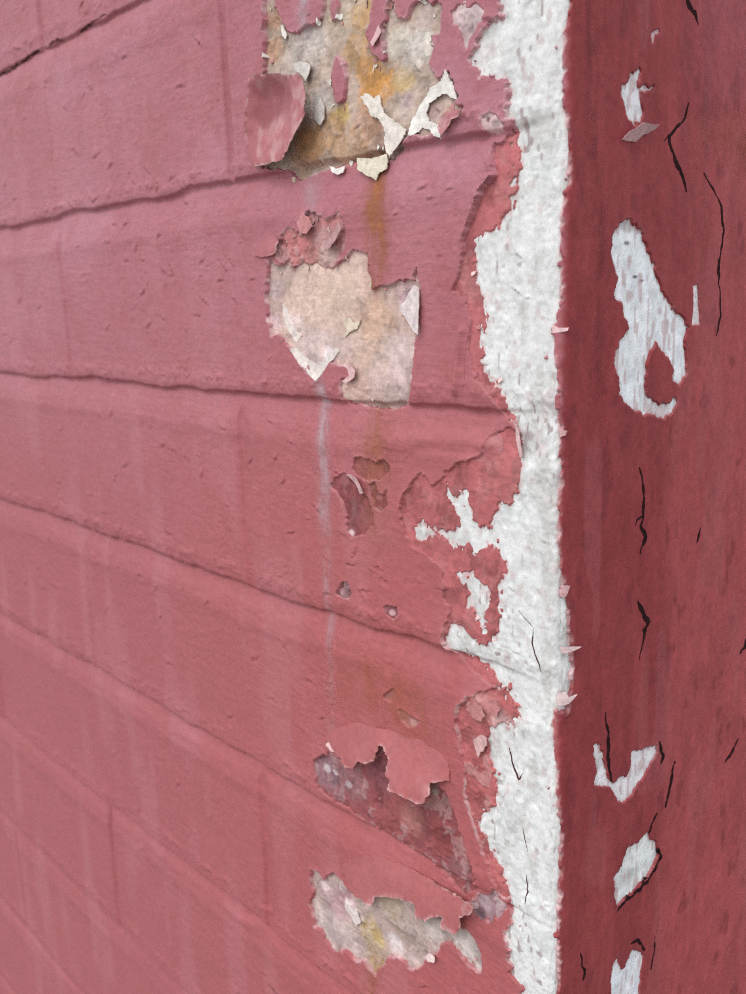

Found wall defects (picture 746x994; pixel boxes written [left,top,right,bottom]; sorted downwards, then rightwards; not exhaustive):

crack [0,14,106,76]
crack [686,0,699,25]
peeling [621,68,661,142]
crack [664,102,725,336]
peeling [611,219,699,418]
peeling [244,0,581,994]
crack [635,467,647,554]
peeling [593,743,656,802]
peeling [614,833,657,905]
peeling [611,950,642,994]